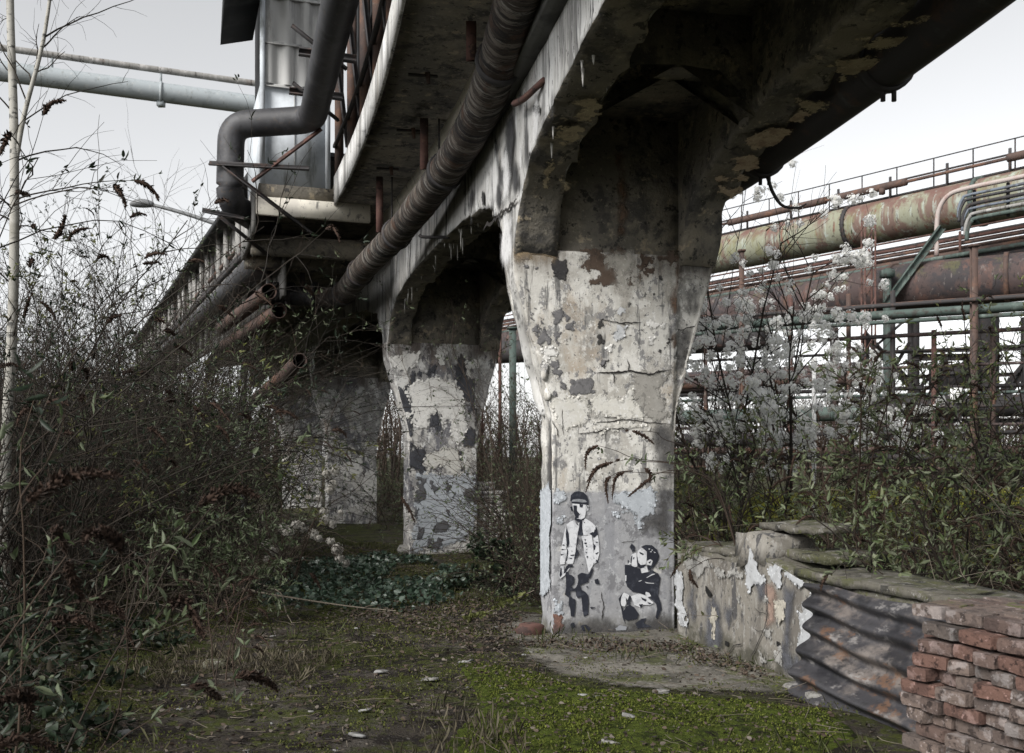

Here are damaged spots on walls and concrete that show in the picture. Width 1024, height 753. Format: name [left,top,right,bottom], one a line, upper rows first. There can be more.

spalling [826,15,931,82]
spalling [715,98,829,199]
spalling [551,254,568,281]
peeling [464,359,482,374]
peeling [530,302,674,435]
crack [598,359,668,382]
peeling [389,346,477,552]
peeling [674,548,813,667]